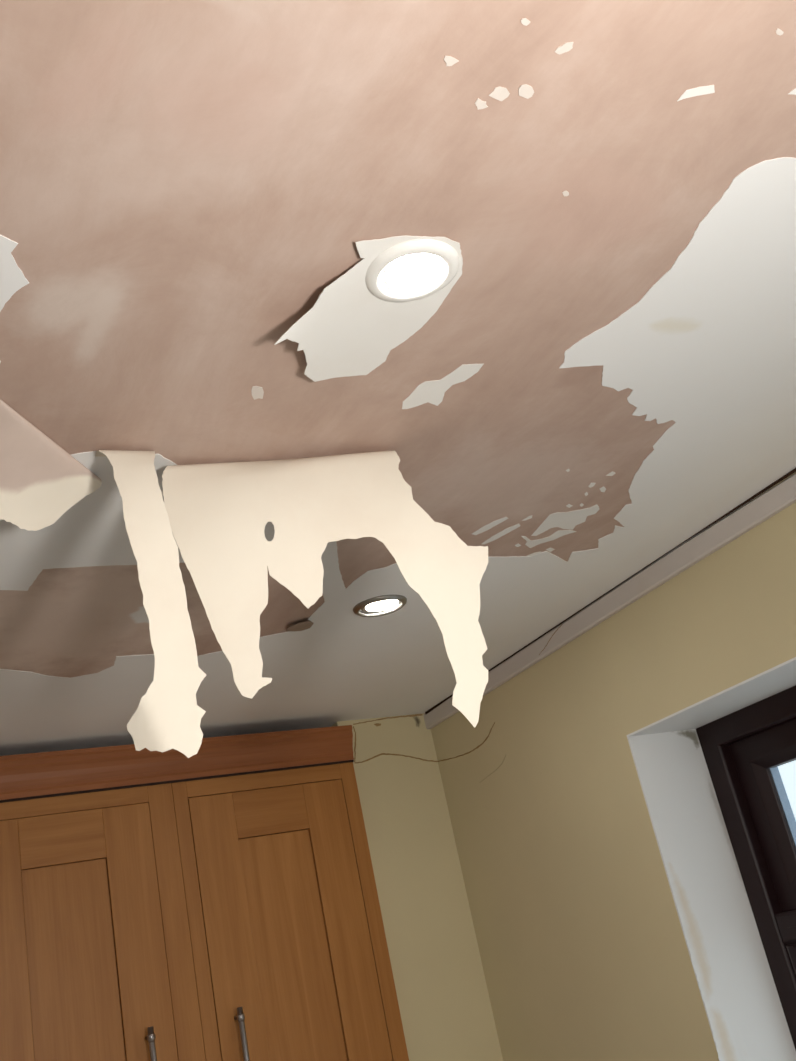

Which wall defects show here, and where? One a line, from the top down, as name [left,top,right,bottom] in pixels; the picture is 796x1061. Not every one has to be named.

peeling [0,0,796,561]
peeling [0,565,154,678]
peeling [179,563,222,656]
peeling [260,567,325,637]
peeling [336,537,396,588]
crack [488,468,796,672]
crack [353,694,506,782]